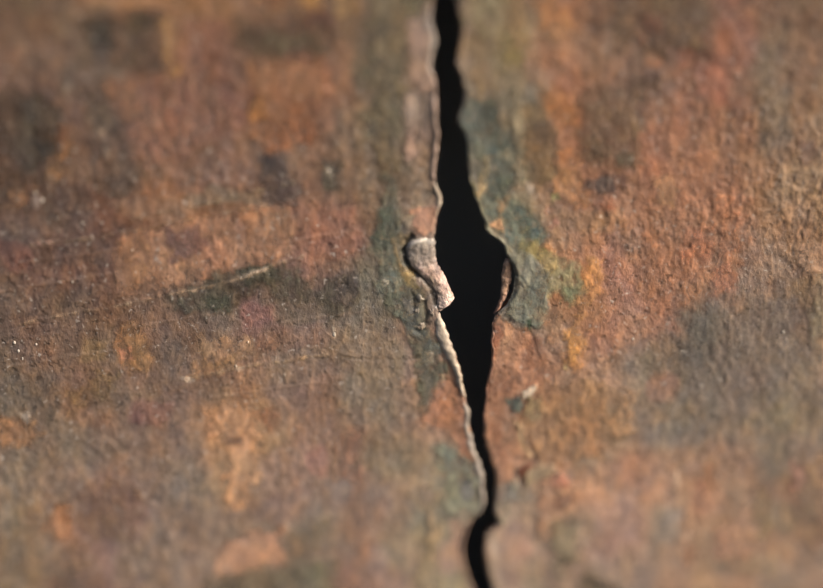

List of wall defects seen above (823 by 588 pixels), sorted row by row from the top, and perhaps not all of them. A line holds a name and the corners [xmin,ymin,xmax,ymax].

rust [247,58,324,153]
rust [404,207,436,236]
crack [426,0,515,588]
rust [551,147,586,207]
rust [576,257,603,319]
rust [640,135,823,391]
rust [91,321,153,399]
rust [483,310,587,485]